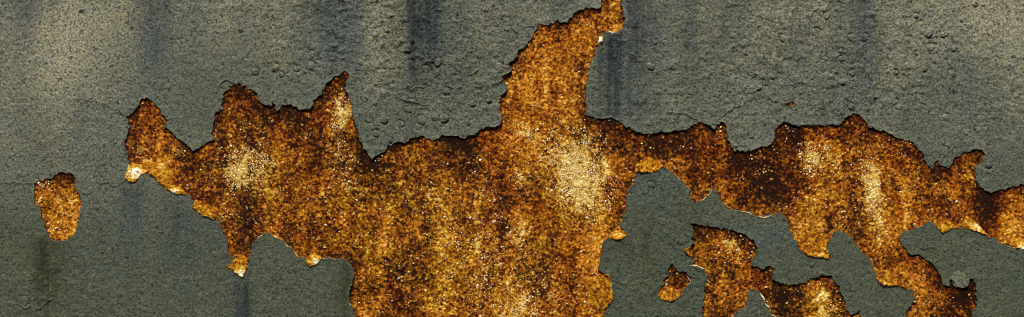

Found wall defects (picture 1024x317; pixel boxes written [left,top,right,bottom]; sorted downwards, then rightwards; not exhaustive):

corrosion [34,172,82,267]
corrosion [658,224,860,317]
peeling [951,271,970,288]